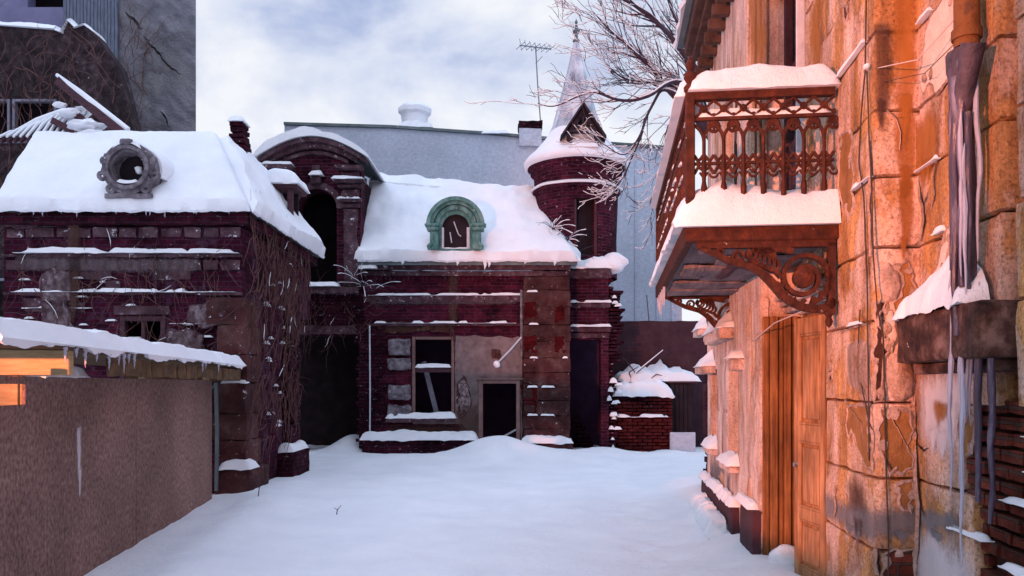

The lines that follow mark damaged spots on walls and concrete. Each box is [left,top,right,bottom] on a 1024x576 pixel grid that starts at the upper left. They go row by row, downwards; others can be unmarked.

crack [125,11,181,74]
leakage [874,25,890,127]
flaking render [845,259,919,514]
crack [886,395,928,571]